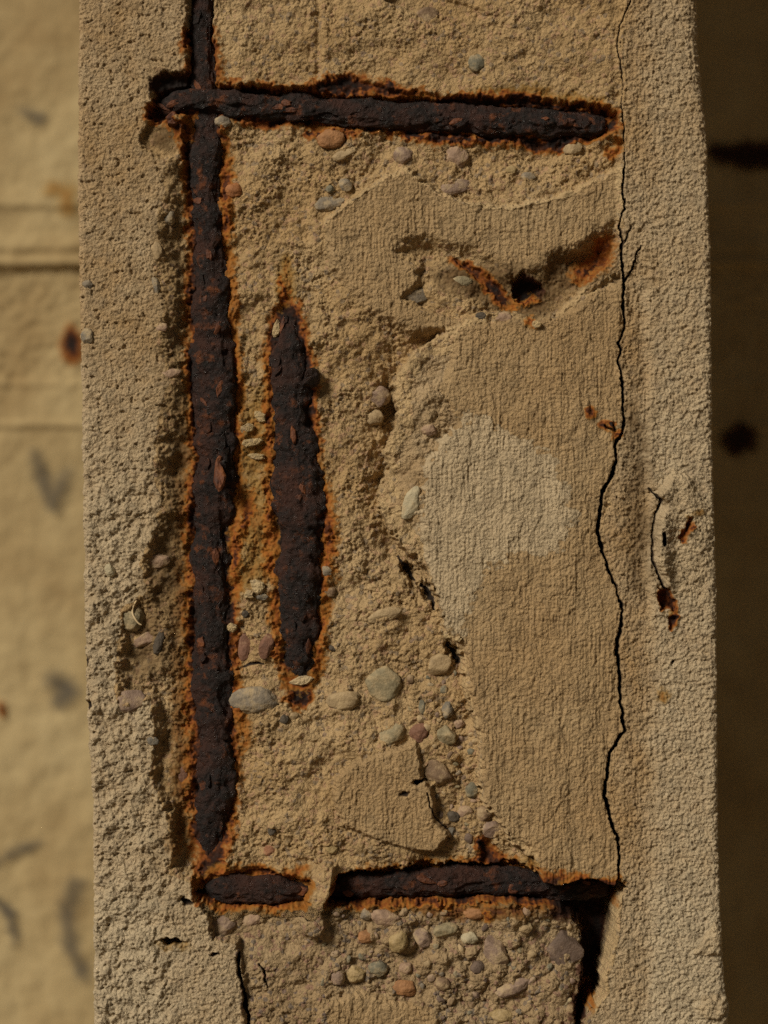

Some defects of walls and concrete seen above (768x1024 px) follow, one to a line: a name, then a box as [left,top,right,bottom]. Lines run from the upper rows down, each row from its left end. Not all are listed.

spalling [113,0,629,1024]
corrosion [142,25,626,1024]
crack [596,0,641,872]
crack [648,488,667,589]